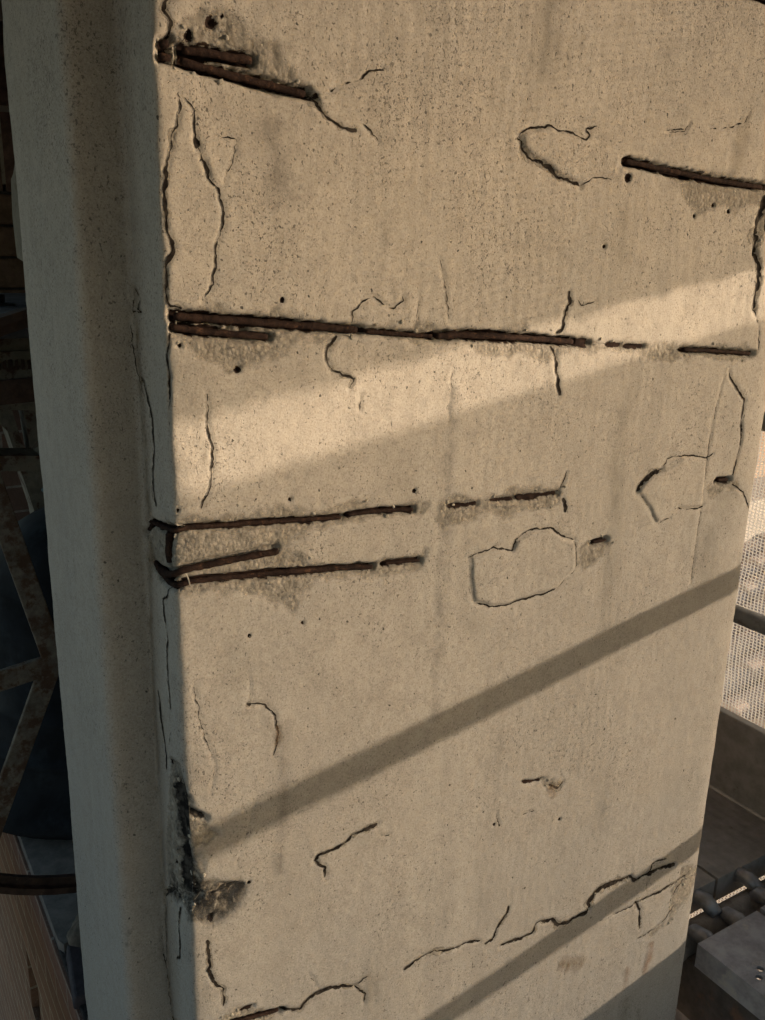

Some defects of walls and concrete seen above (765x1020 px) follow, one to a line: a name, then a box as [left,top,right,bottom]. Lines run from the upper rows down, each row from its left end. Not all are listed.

crack [160,0,174,40]
crack [161,94,237,309]
crack [748,191,765,350]
crack [130,289,172,506]
crack [201,394,214,508]
crack [246,684,279,756]
spalling [166,757,251,922]
crack [314,822,389,877]
crack [404,858,686,970]
crack [206,940,228,1006]
spalling [217,1004,278,1020]
crack [279,976,367,1012]